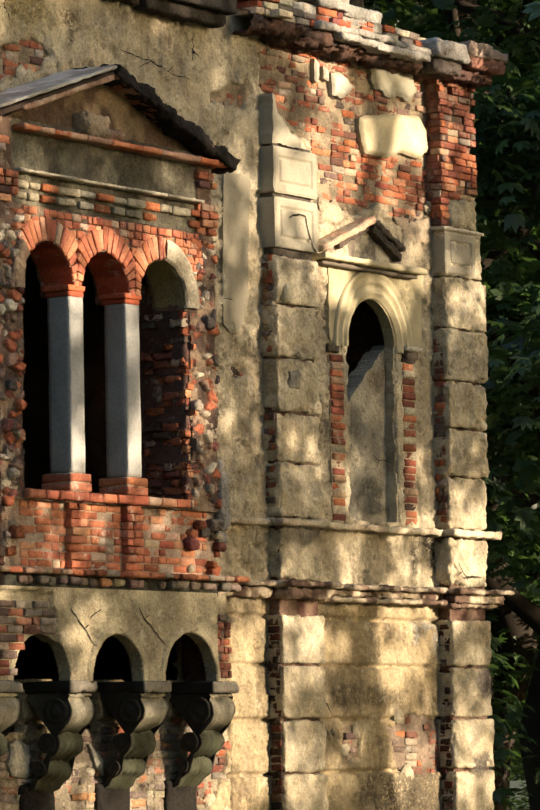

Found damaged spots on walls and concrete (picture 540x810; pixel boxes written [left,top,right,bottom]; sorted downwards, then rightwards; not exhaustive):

flaking render [0,34,56,80]
crack [122,42,202,80]
flaking render [210,39,478,246]
crack [70,608,102,646]